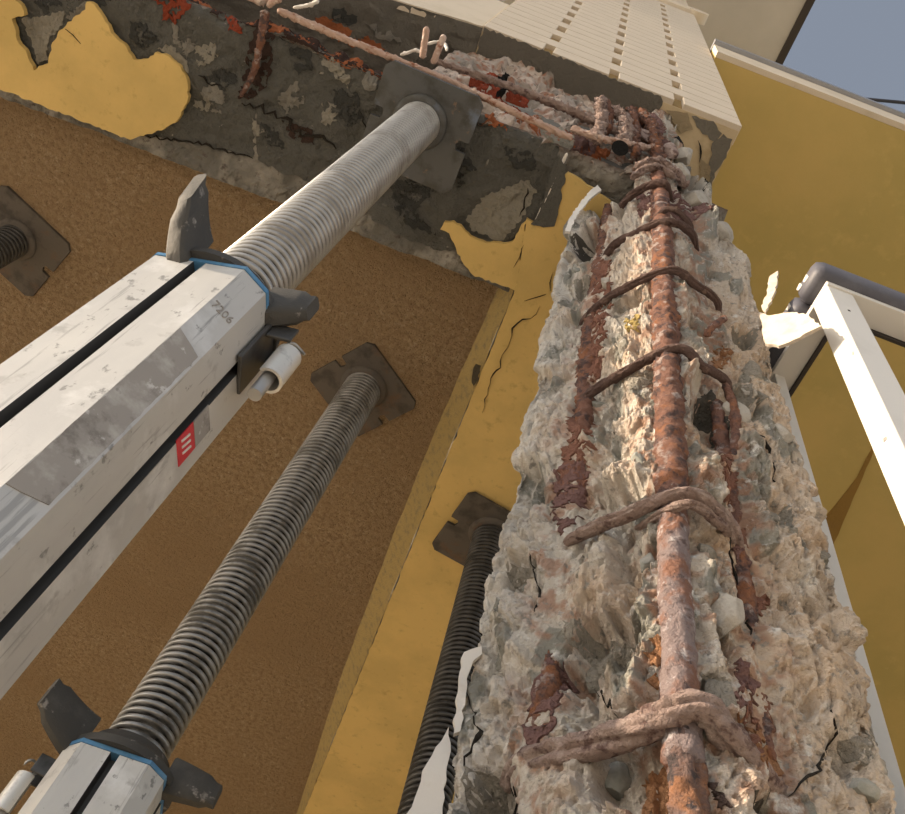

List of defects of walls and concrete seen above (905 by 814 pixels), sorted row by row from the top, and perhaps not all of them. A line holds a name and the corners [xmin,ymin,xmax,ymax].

spalling [16,0,89,68]
rust [155,0,385,100]
spalling [100,0,693,251]
rust [469,72,611,161]
crack [484,273,553,407]
rust [587,259,614,383]
flaking render [731,271,822,351]
rust [550,416,597,536]
spalling [656,501,728,700]
flaking render [407,646,482,814]
spalling [660,721,711,814]
rust [733,657,784,776]